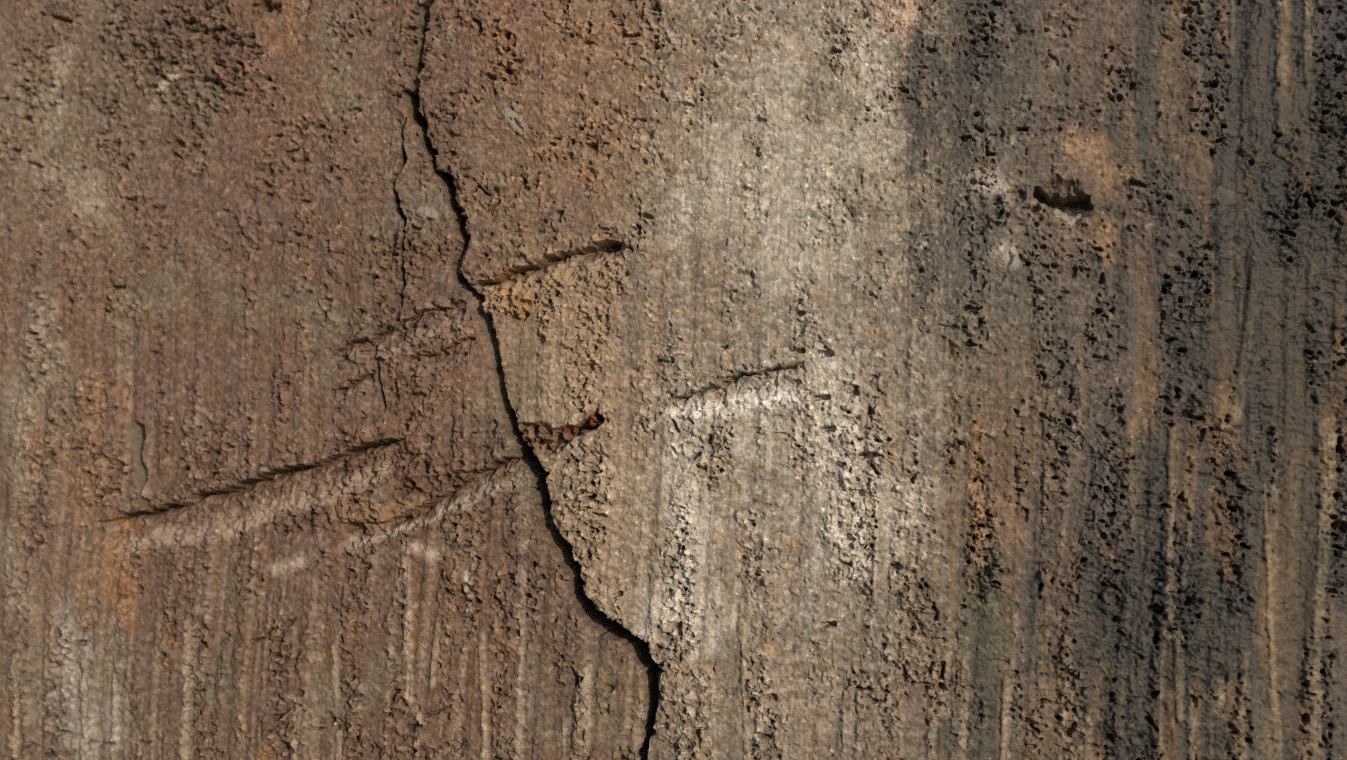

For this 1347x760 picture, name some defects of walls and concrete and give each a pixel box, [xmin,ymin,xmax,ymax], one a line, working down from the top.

crack [372,0,665,760]
leakage [1050,0,1347,760]
crack [237,626,275,659]
crack [101,676,164,760]
crack [270,691,349,733]